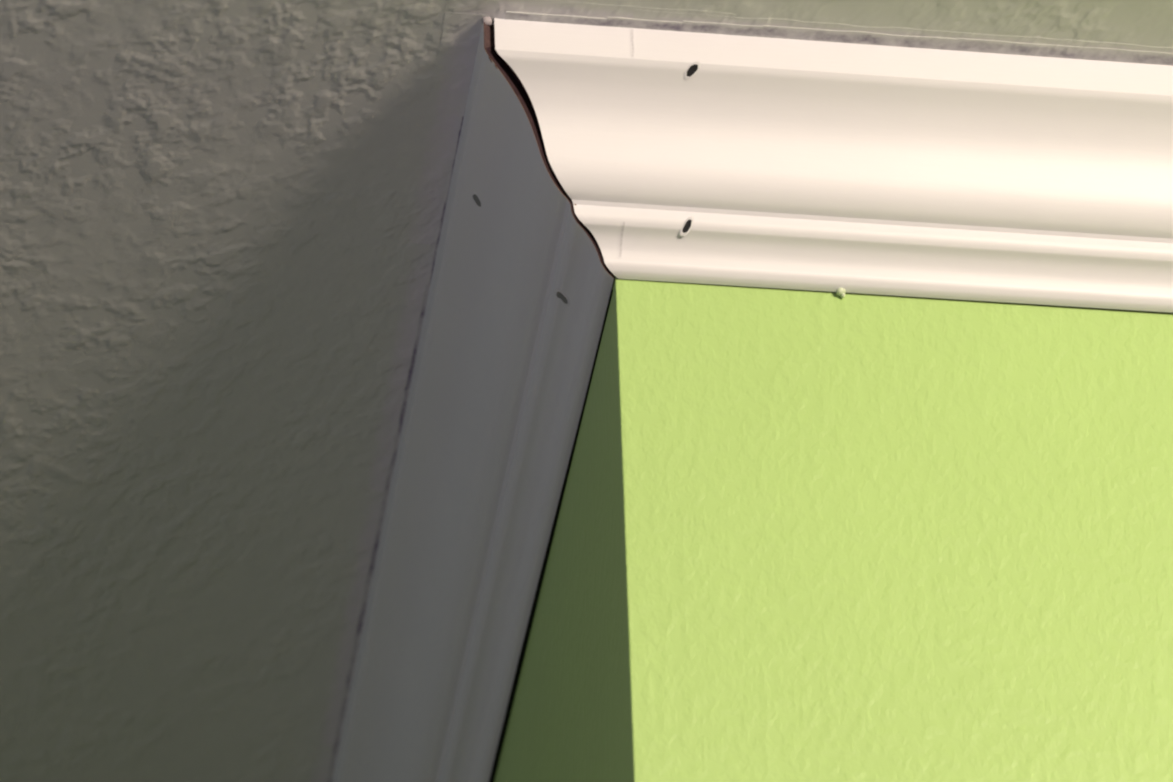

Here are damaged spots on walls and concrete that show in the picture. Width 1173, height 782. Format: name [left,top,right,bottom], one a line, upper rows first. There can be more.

crack [481,11,1173,782]